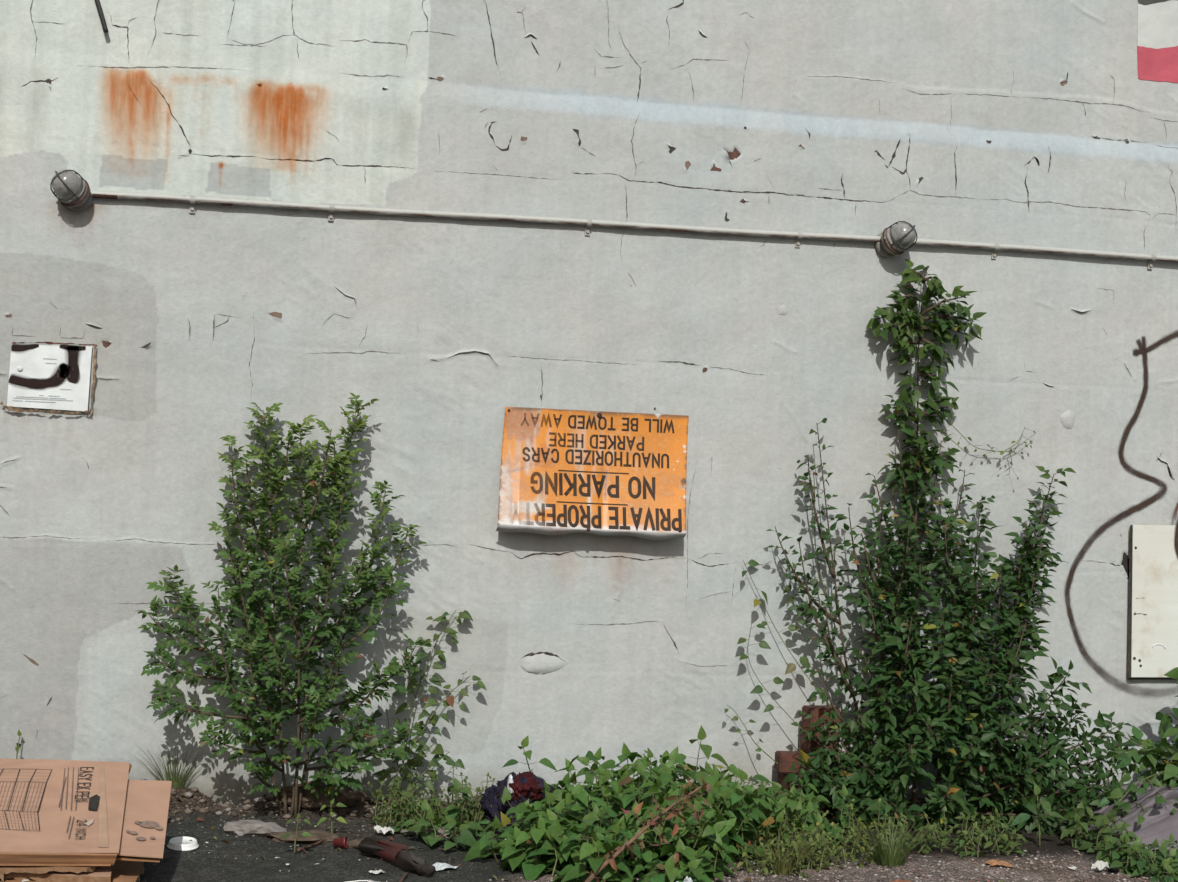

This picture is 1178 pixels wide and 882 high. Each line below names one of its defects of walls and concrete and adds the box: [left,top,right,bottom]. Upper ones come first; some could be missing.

crack [23,0,455,182]
peeling [710,148,741,171]
crack [437,0,1177,285]
crack [387,460,770,599]